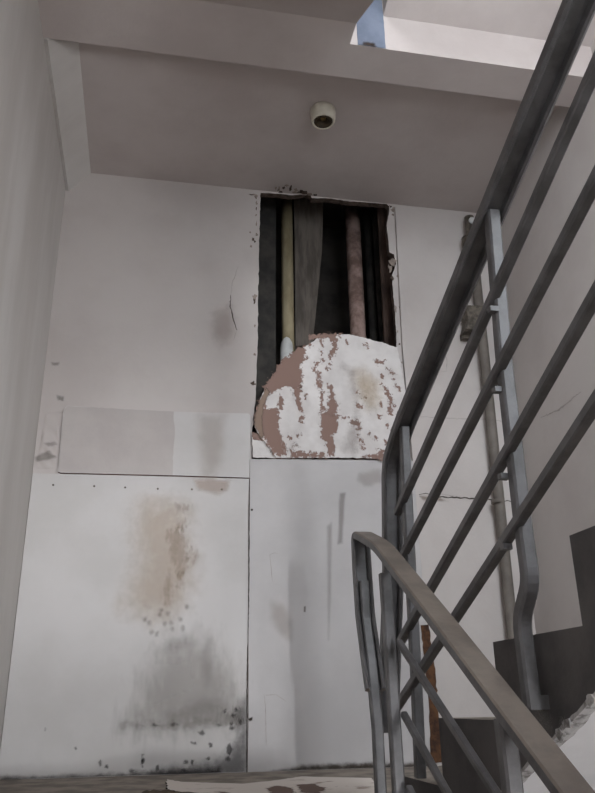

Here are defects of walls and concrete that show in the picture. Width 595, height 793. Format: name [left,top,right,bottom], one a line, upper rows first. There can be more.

peeling [251,332,387,461]
peeling [374,358,401,431]
spalling [552,692,595,747]
leakage [119,761,219,776]
spalling [521,761,535,783]